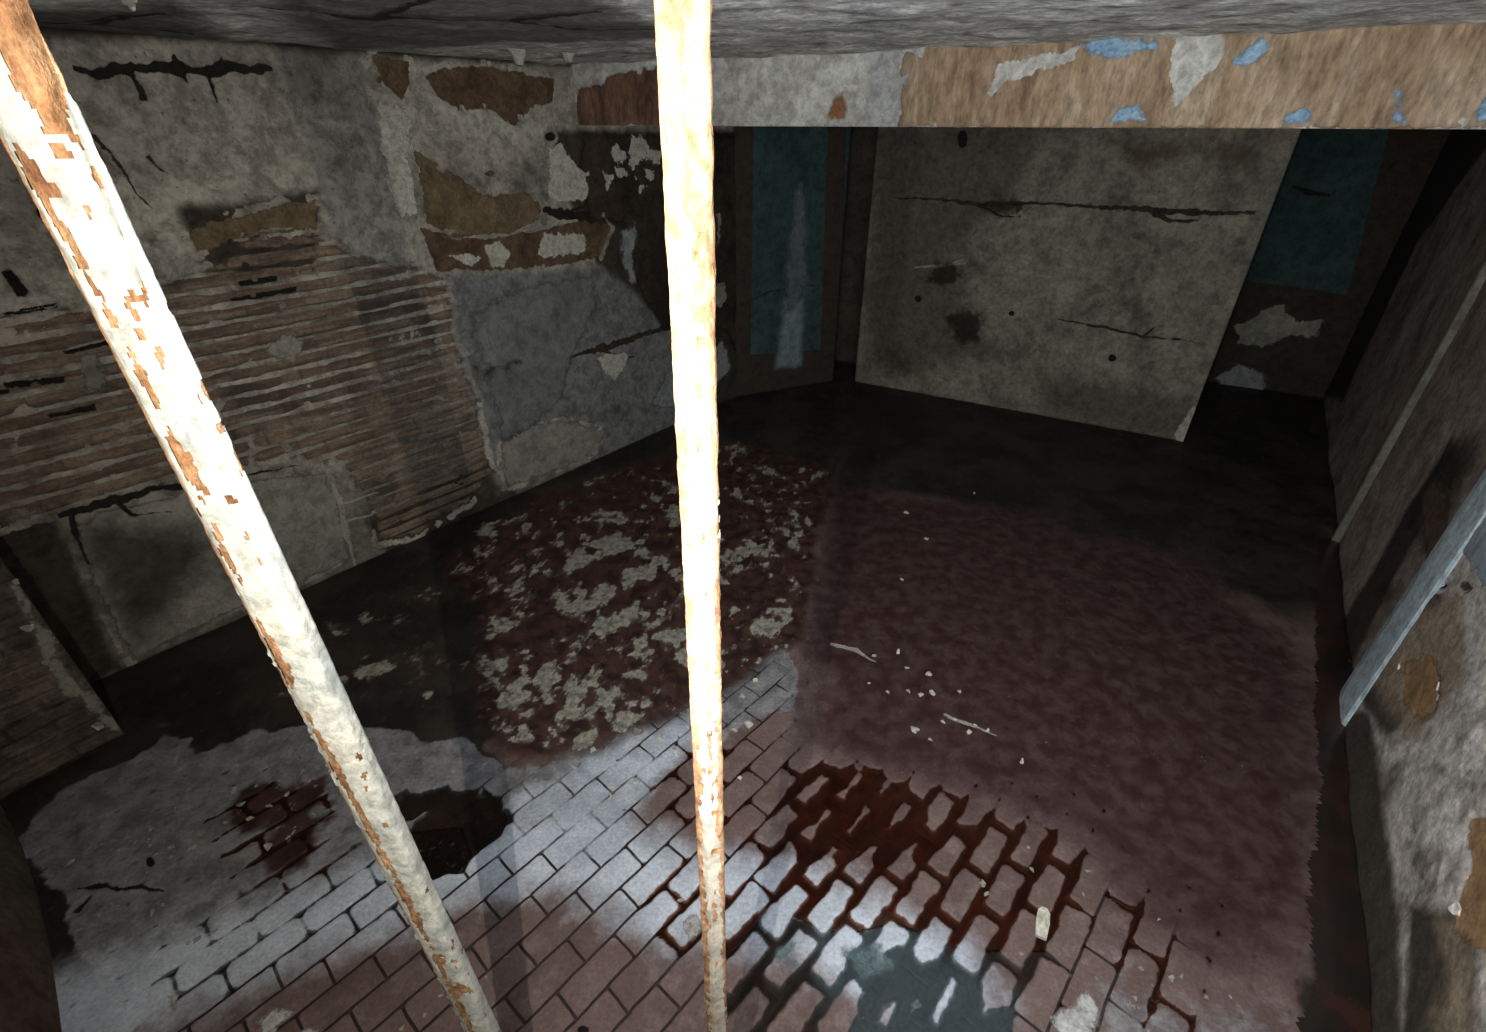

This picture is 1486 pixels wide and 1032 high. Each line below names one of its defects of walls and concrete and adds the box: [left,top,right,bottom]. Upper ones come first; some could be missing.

flaking render [121,0,138,12]
crack [36,13,273,103]
rust [828,96,847,120]
peeling [896,23,1486,129]
crack [895,197,1256,223]
crack [57,483,183,565]
crack [248,465,379,566]
flaking render [0,51,662,1032]
peeling [1463,517,1486,587]
flaking render [1448,817,1486,952]